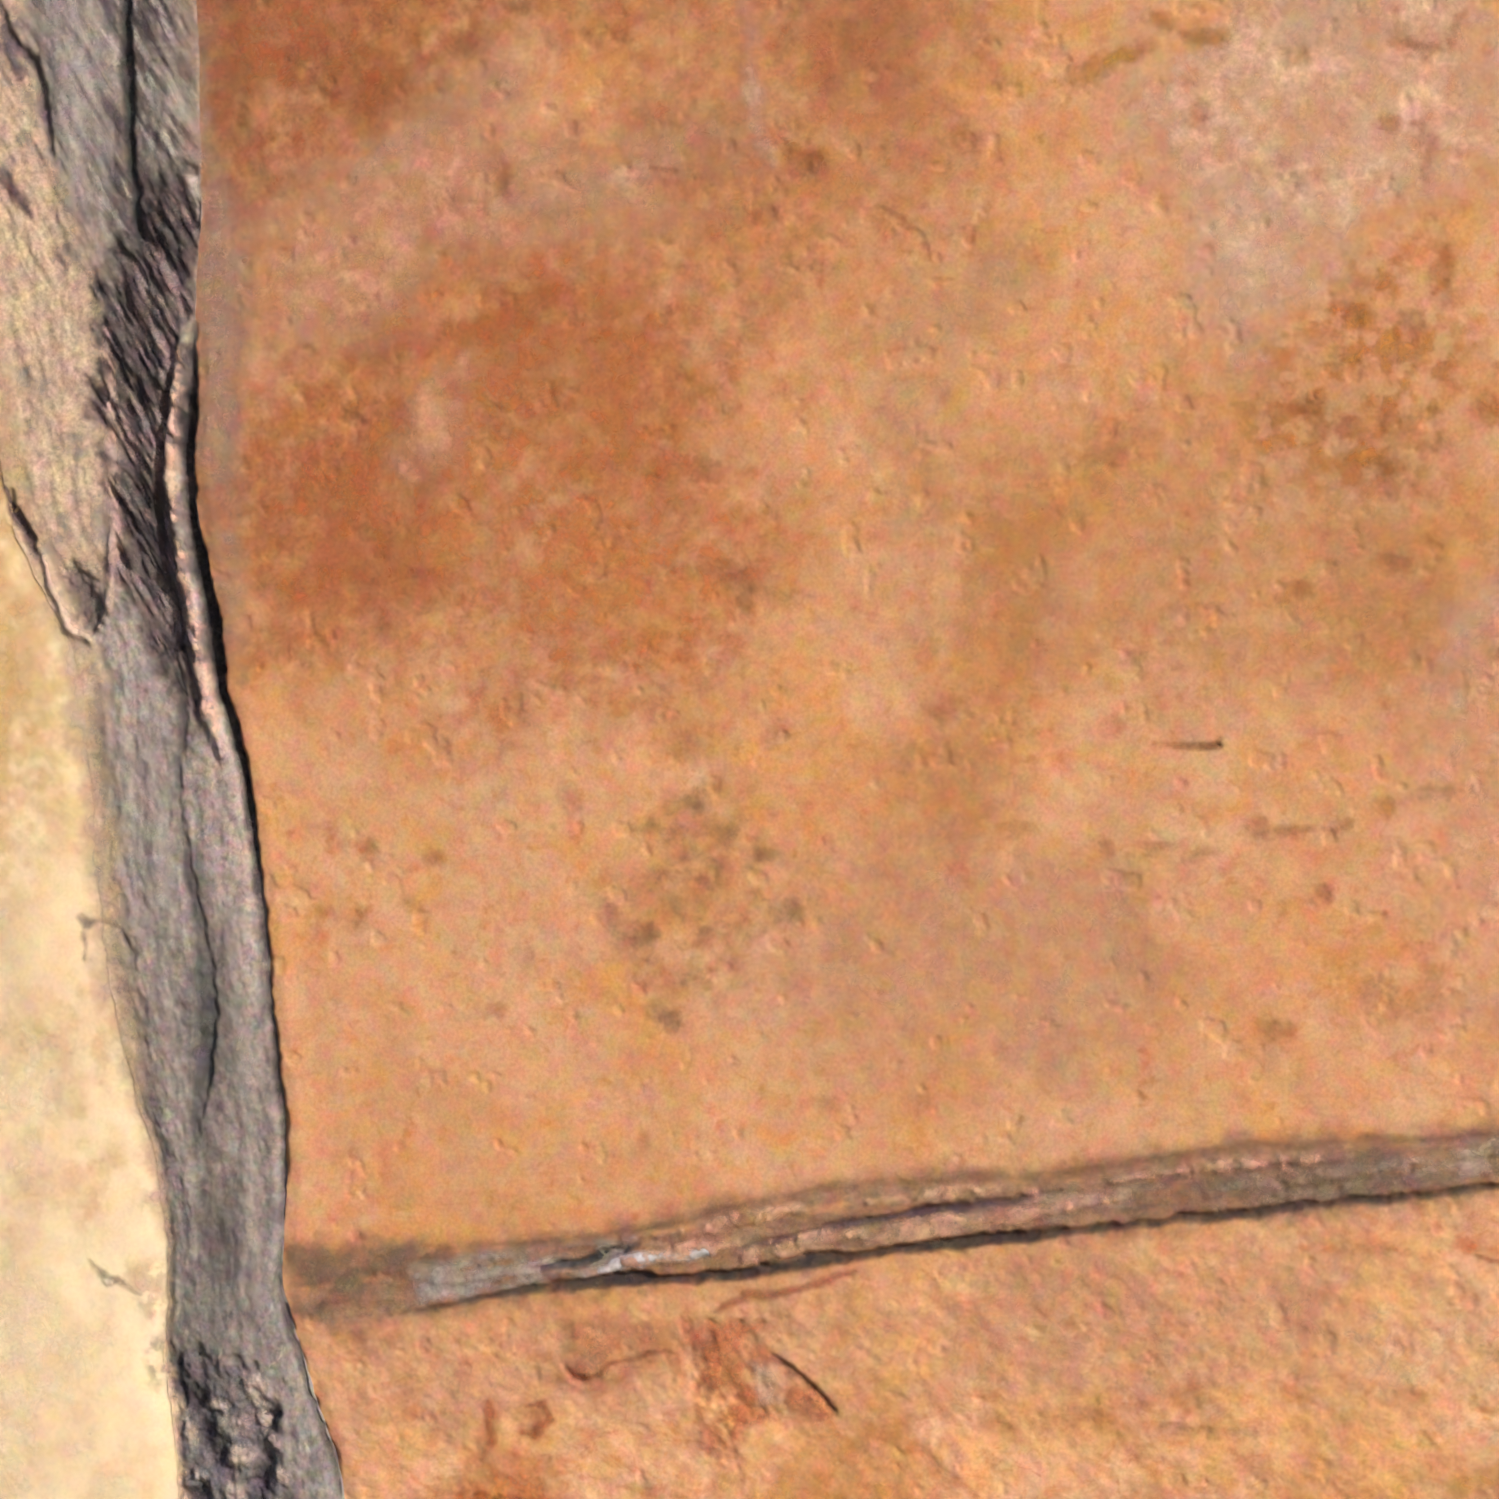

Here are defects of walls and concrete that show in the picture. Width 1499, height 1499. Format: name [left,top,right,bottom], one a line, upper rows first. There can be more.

crack [120,0,143,248]
crack [157,350,287,1182]
crack [80,918,91,927]
spalling [288,1127,1499,1454]
crack [441,1143,1499,1308]
crack [283,1304,338,1462]
peeling [456,1463,555,1499]